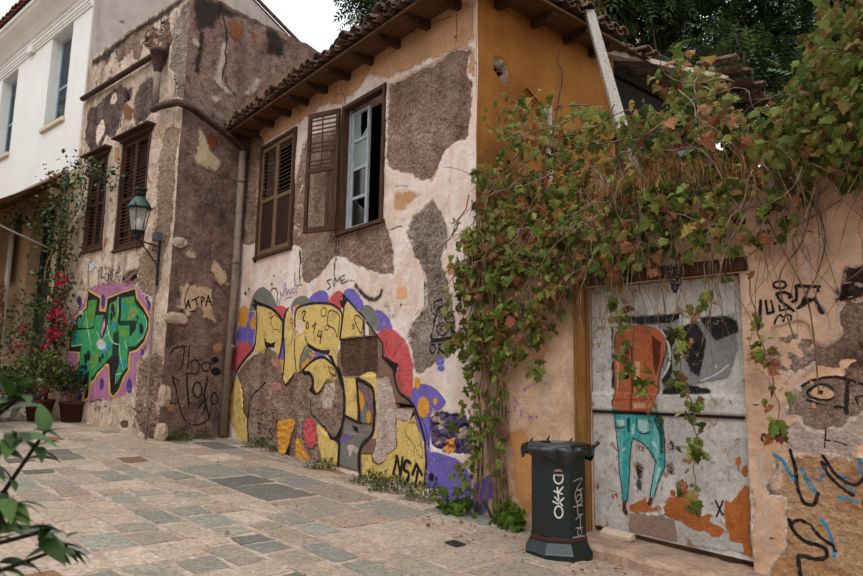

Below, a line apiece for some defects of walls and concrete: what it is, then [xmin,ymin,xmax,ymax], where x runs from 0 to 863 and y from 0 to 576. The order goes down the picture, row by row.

flaking render [211,42,233,103]
crack [220,1,236,96]
flaking render [241,2,476,247]
flaking render [293,132,394,284]
peeling [396,287,409,307]
flaking render [406,200,456,376]
flaking render [241,335,414,469]
flaking render [762,264,863,576]
peeling [612,456,756,557]